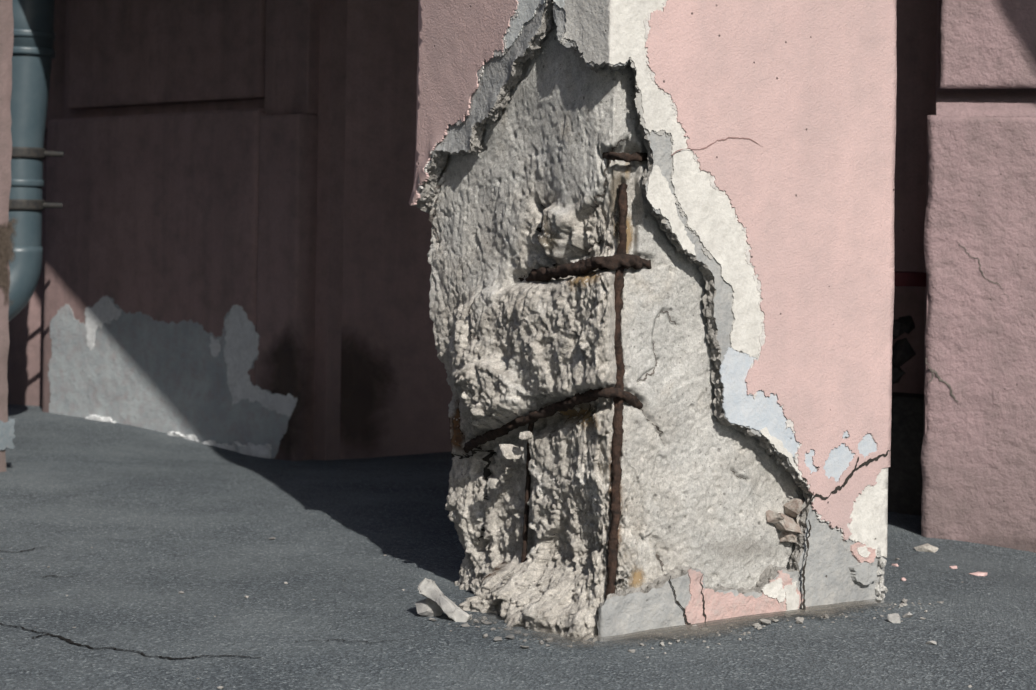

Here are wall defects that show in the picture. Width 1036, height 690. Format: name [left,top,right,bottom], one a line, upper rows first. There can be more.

rust [610,169,632,253]
peeling [0,418,15,450]
peeling [48,295,298,459]
rust [558,408,595,425]
spalling [427,0,877,642]
crack [801,450,889,615]
peeling [841,468,906,602]